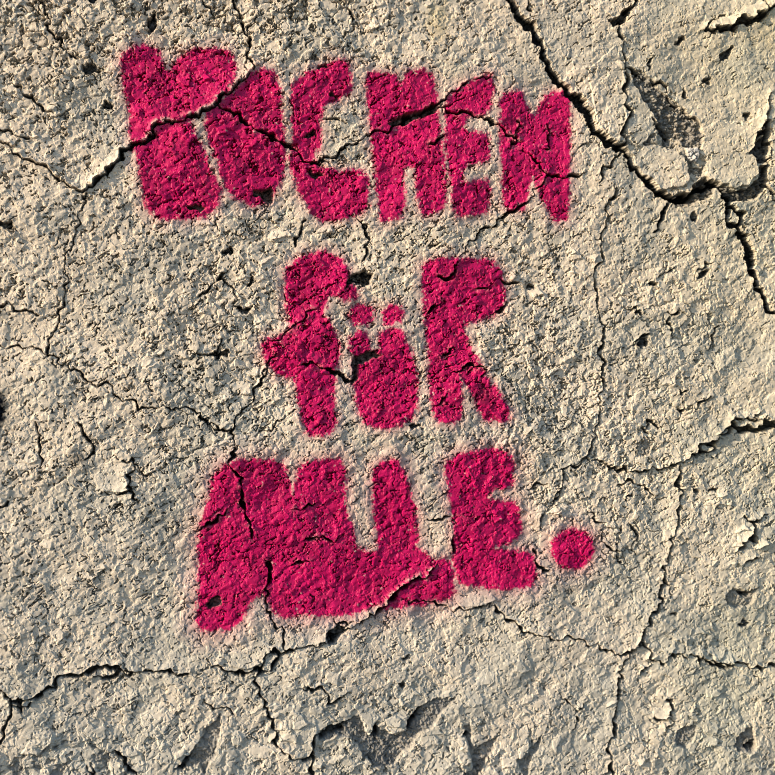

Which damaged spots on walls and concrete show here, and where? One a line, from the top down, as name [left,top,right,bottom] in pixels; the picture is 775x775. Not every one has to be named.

flaking render [632,57,771,222]
crack [0,0,775,540]
crack [211,187,775,775]
crack [0,664,190,746]
crack [204,699,236,717]
crack [86,763,96,775]
crack [110,750,138,775]